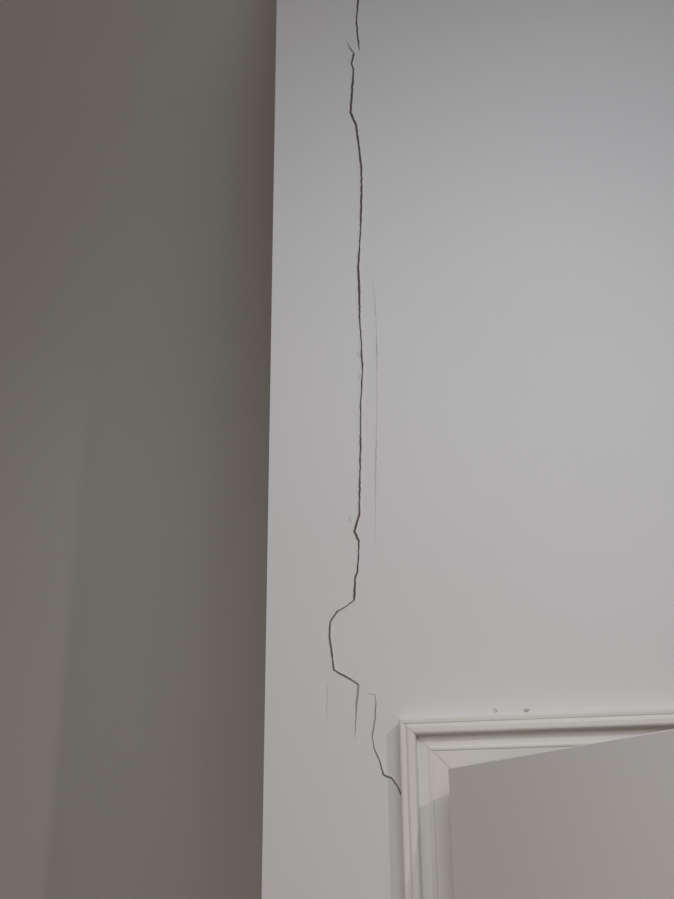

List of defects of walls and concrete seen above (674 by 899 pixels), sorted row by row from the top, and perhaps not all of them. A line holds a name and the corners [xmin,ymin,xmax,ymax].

crack [326,0,401,795]